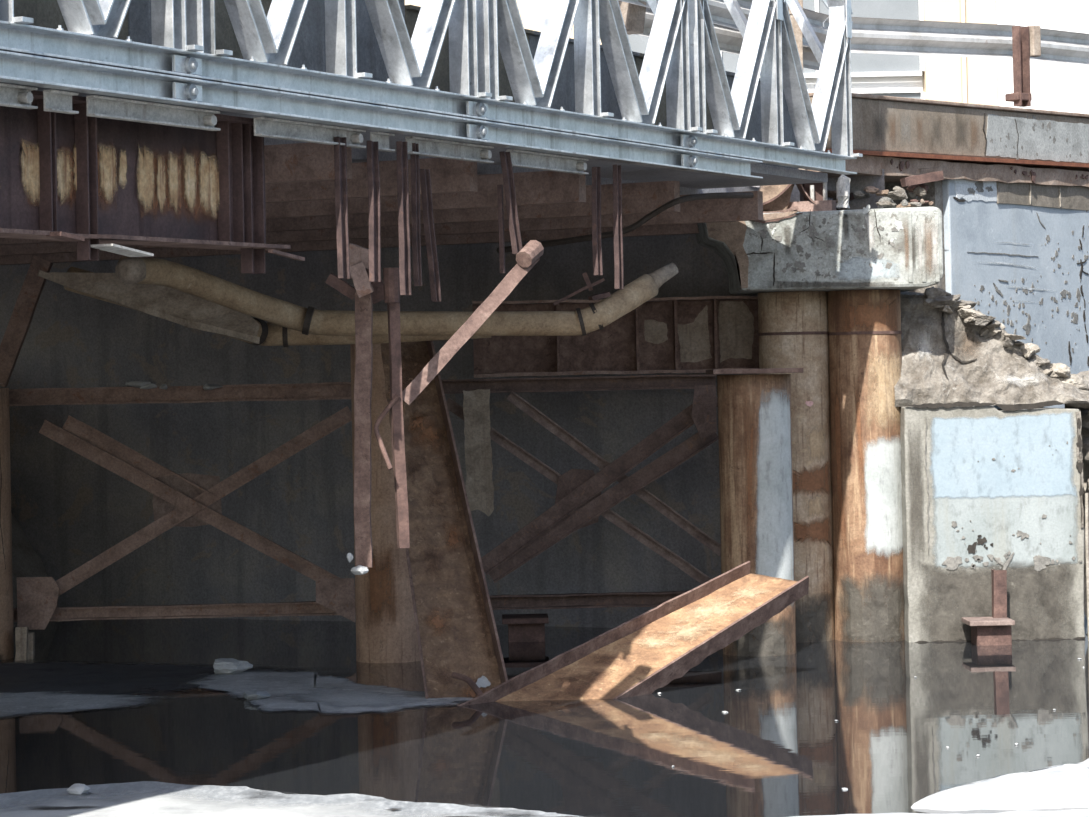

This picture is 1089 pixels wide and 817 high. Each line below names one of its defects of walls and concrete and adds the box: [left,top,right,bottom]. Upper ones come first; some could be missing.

rust [150,153,209,219]
peeling [967,181,993,195]
crack [747,237,775,286]
peeling [973,230,1089,353]
crack [1068,225,1089,366]
spalling [995,400,1064,411]
spalling [1049,411,1084,528]
peeling [942,520,1011,570]
peeling [1012,530,1060,571]
rust [640,588,763,647]
damp [923,563,1074,642]